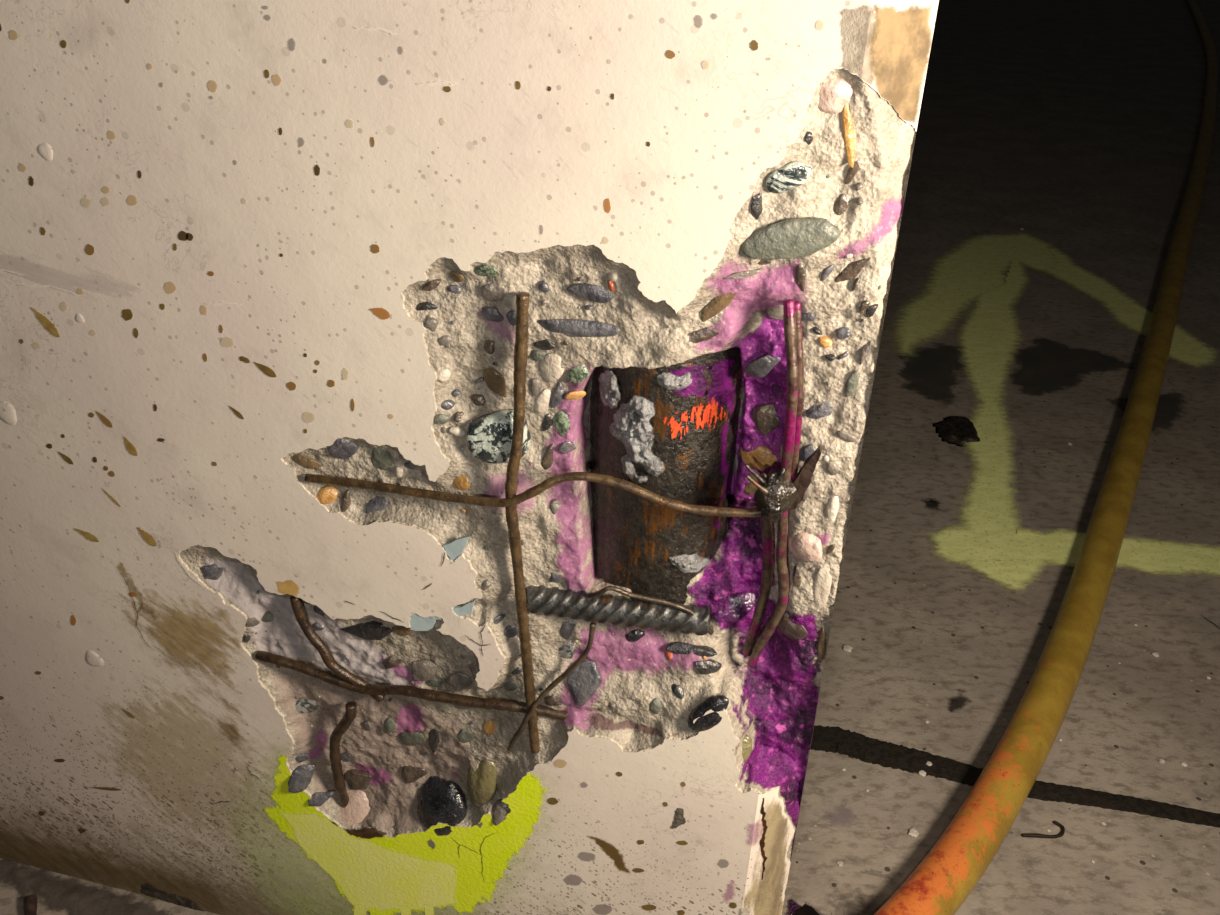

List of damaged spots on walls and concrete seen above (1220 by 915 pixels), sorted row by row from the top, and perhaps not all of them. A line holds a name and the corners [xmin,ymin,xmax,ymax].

water stain [869,6,931,122]
spalling [180,5,916,860]
corrosion [635,374,671,440]
corrosion [617,501,687,584]
crack [117,566,150,647]
crack [760,798,768,880]